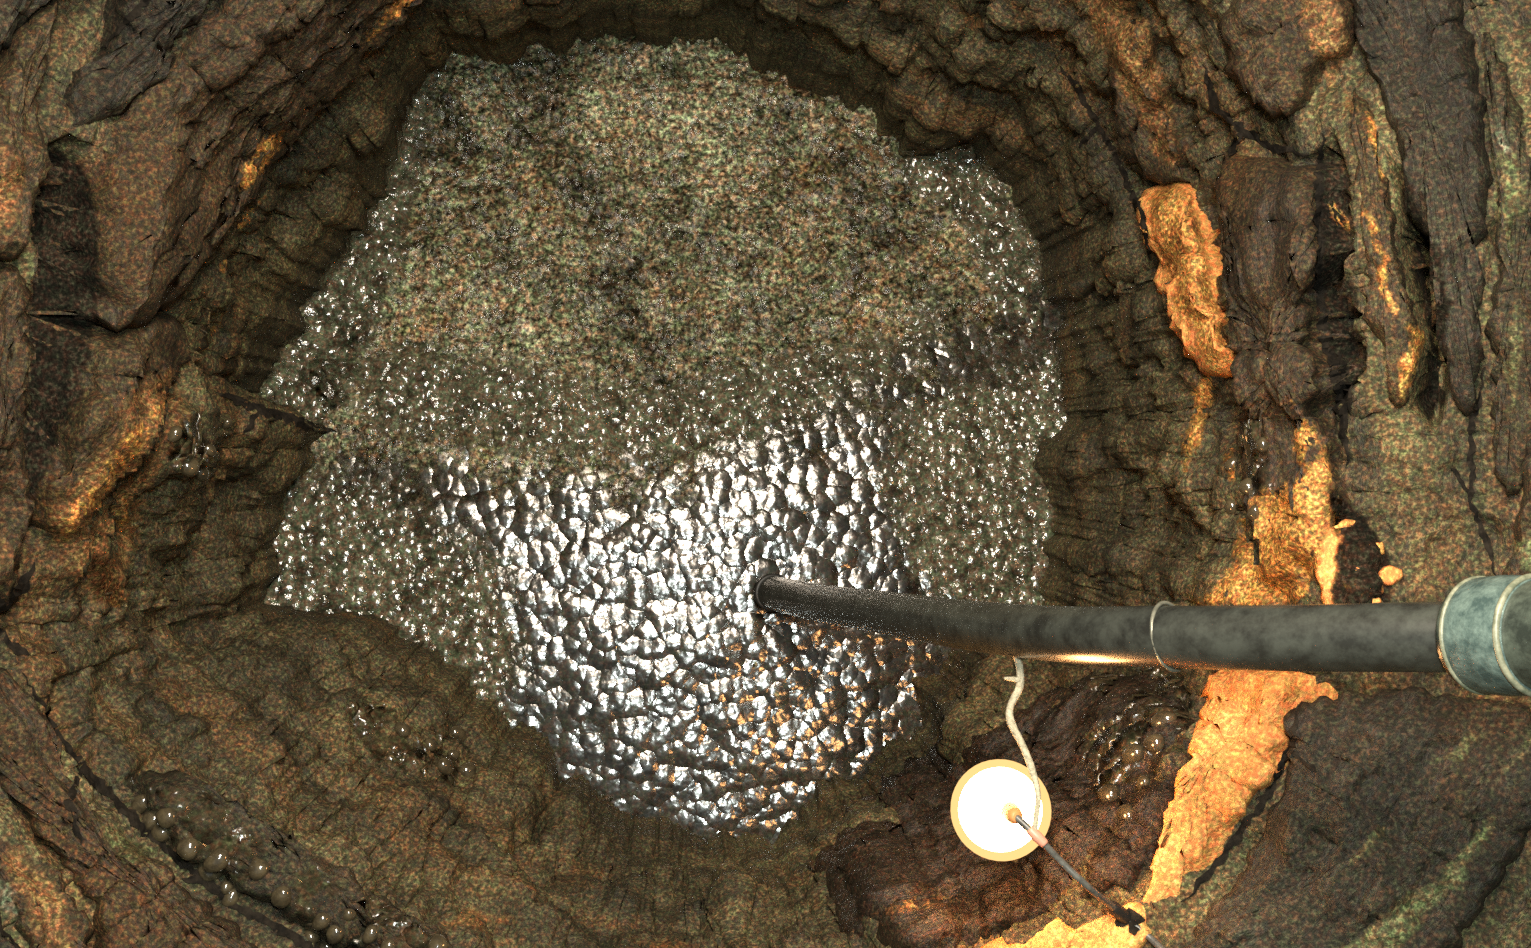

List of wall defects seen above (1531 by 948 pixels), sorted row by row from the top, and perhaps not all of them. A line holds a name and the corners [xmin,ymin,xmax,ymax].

rust [1078,0,1178,165]
rust [1151,184,1228,471]
leakage [98,787,449,948]